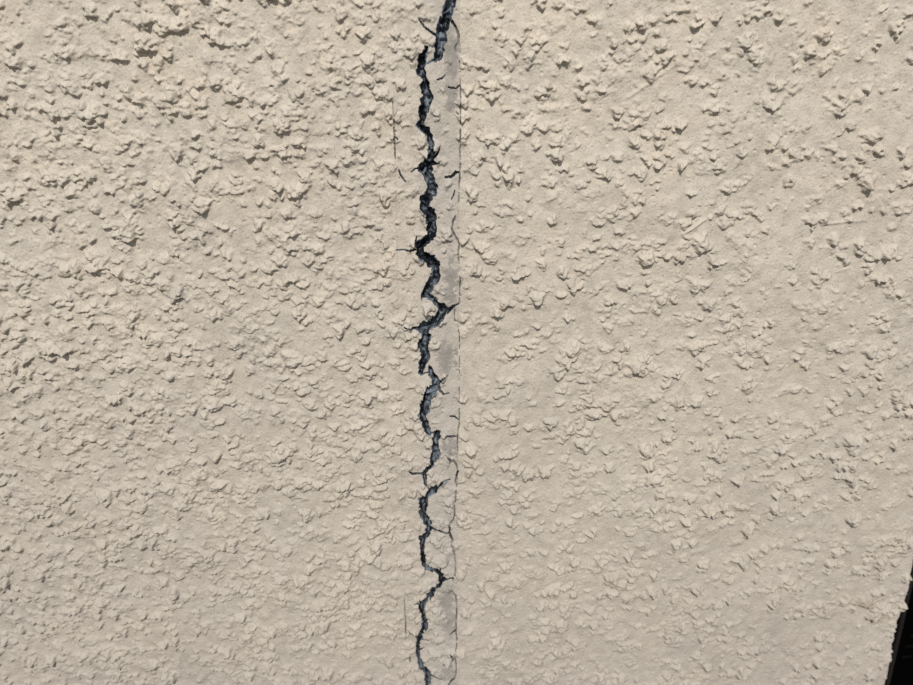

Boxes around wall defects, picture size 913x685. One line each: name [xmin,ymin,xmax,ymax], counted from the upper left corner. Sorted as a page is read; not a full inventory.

crack [392,0,462,685]